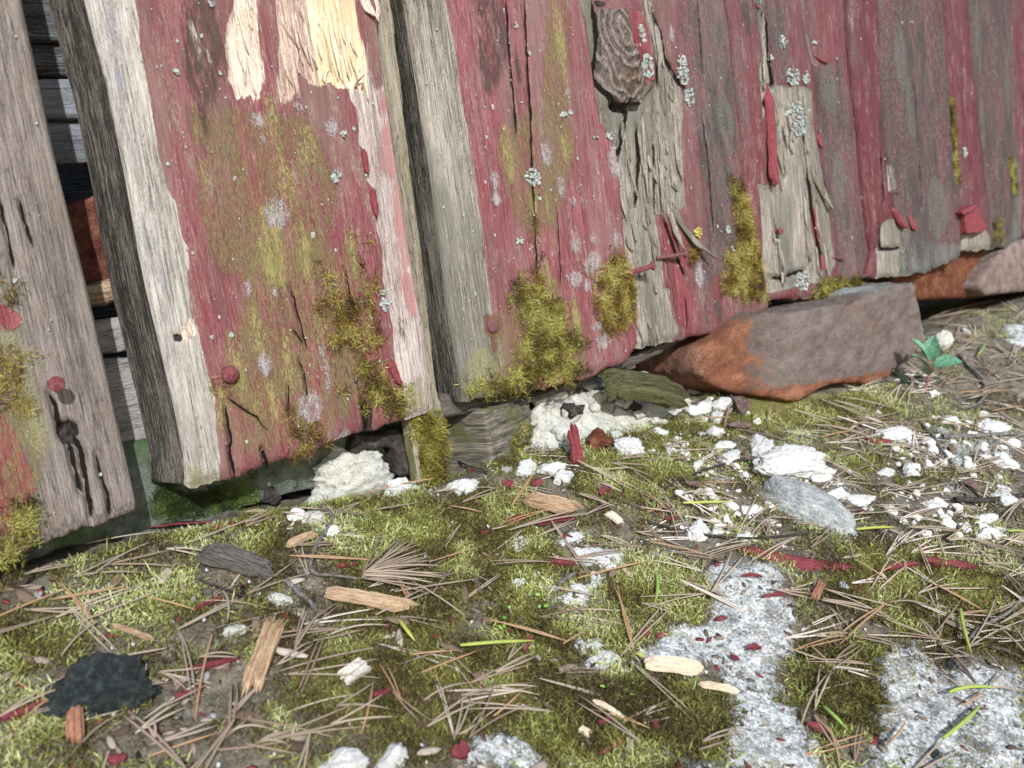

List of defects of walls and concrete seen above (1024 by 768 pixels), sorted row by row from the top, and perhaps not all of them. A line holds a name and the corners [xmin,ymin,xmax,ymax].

crack [49,393,110,517]
crack [225,287,308,478]
peeling [348,6,429,420]
crack [506,0,561,283]
peeling [578,0,717,349]
peeling [754,0,846,294]
peeling [875,164,918,279]
peeling [960,230,993,252]